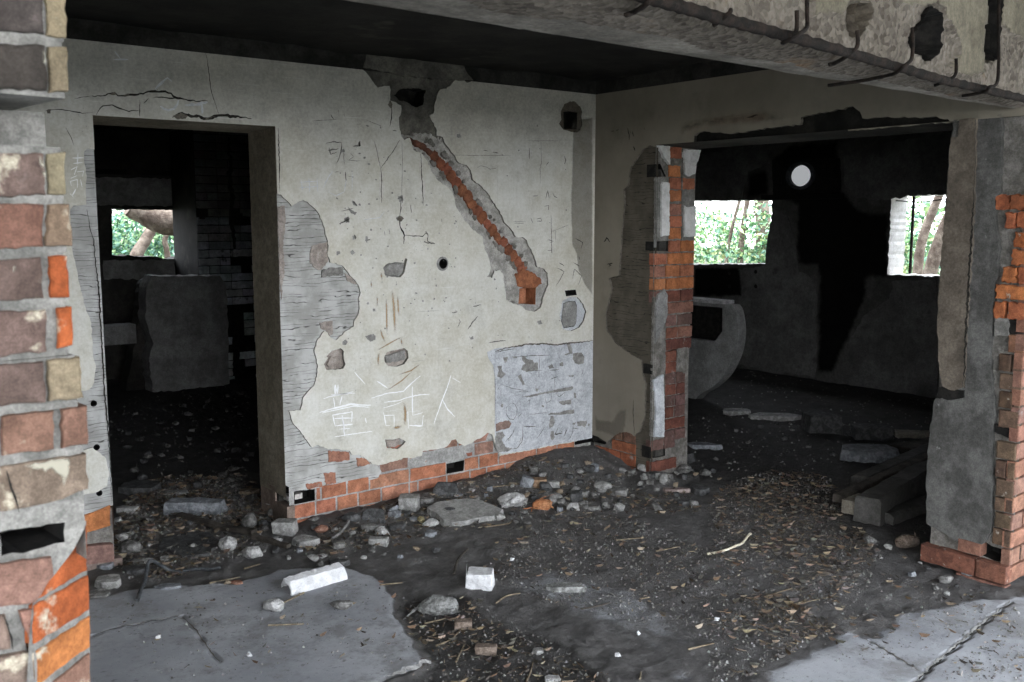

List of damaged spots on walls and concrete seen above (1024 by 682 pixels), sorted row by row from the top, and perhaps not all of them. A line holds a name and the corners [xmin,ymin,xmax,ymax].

crack [46,56,251,145]
spalling [363,54,548,324]
spalling [623,0,1024,103]
spalling [70,149,184,571]
spalling [256,145,722,559]
spalling [983,542,1001,562]